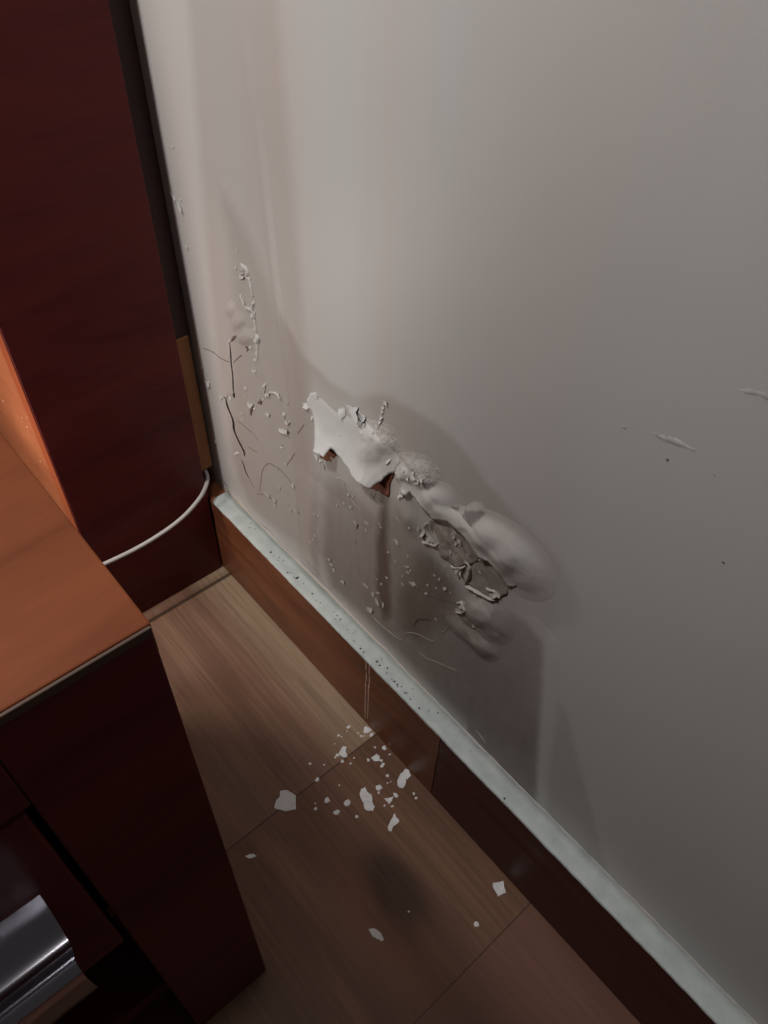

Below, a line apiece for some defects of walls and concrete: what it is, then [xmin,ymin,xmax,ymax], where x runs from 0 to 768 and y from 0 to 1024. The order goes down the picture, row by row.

peeling [235,263,260,374]
crack [204,343,304,500]
peeling [240,383,290,449]
peeling [302,392,517,628]